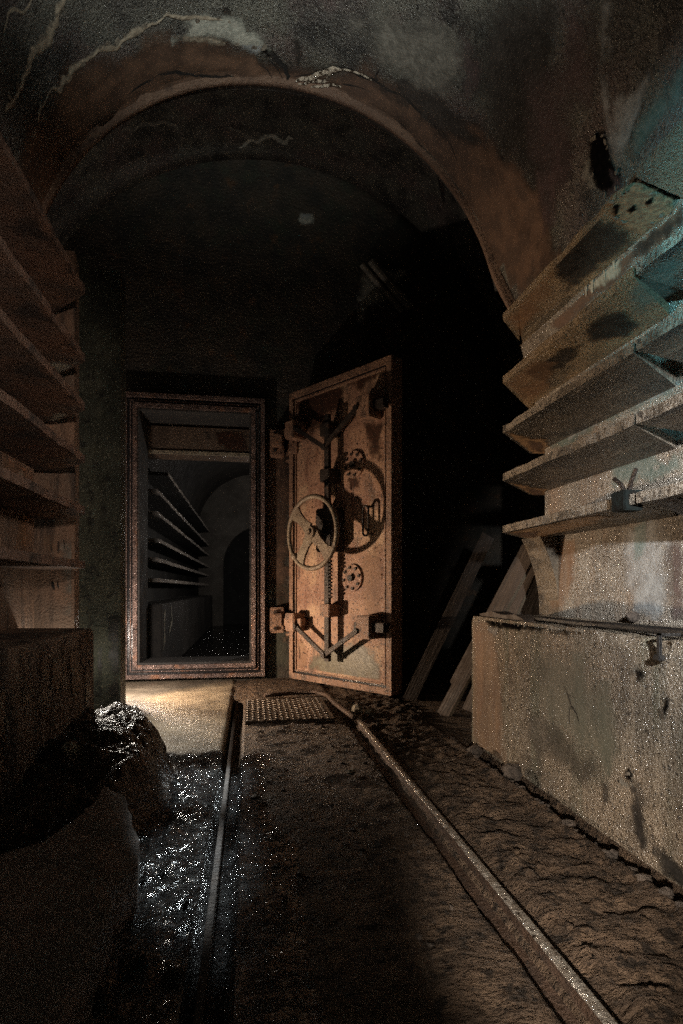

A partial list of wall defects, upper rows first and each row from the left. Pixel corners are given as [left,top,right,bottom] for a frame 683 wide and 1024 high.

water stain [171,7,267,51]
crack [130,70,234,93]
water stain [556,221,631,296]
water stain [525,313,636,380]
corrosion [366,423,383,459]
corrosion [265,387,344,611]